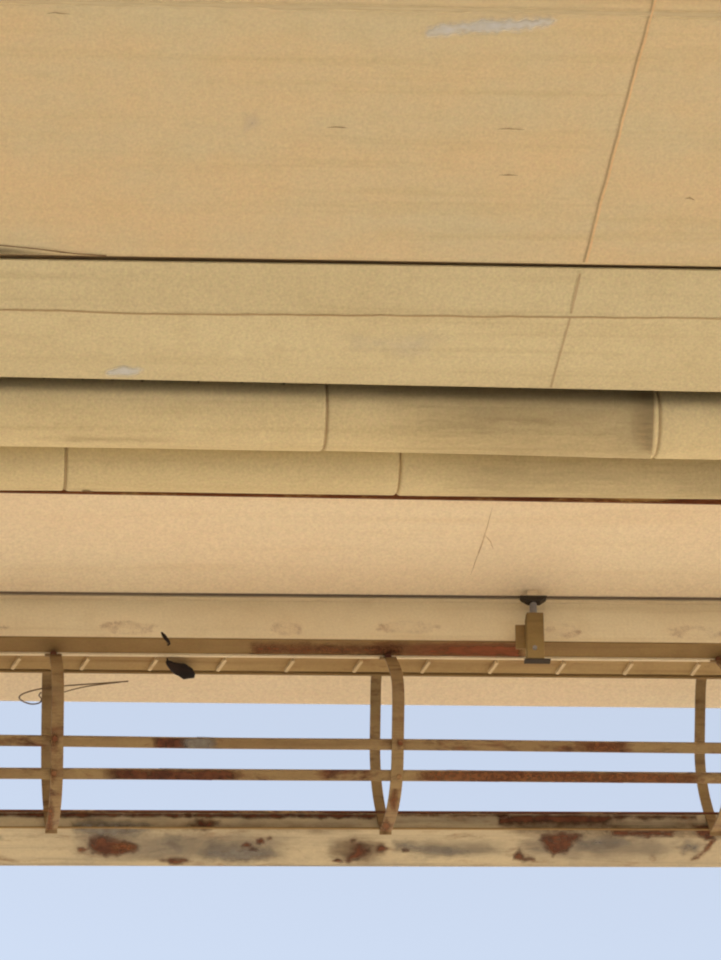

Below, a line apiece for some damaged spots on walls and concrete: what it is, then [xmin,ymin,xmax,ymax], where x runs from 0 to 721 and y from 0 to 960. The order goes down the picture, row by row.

crack [470,510,494,575]
rust [0,807,392,833]
rust [390,790,716,860]
rust [78,837,137,856]
rust [333,839,388,863]